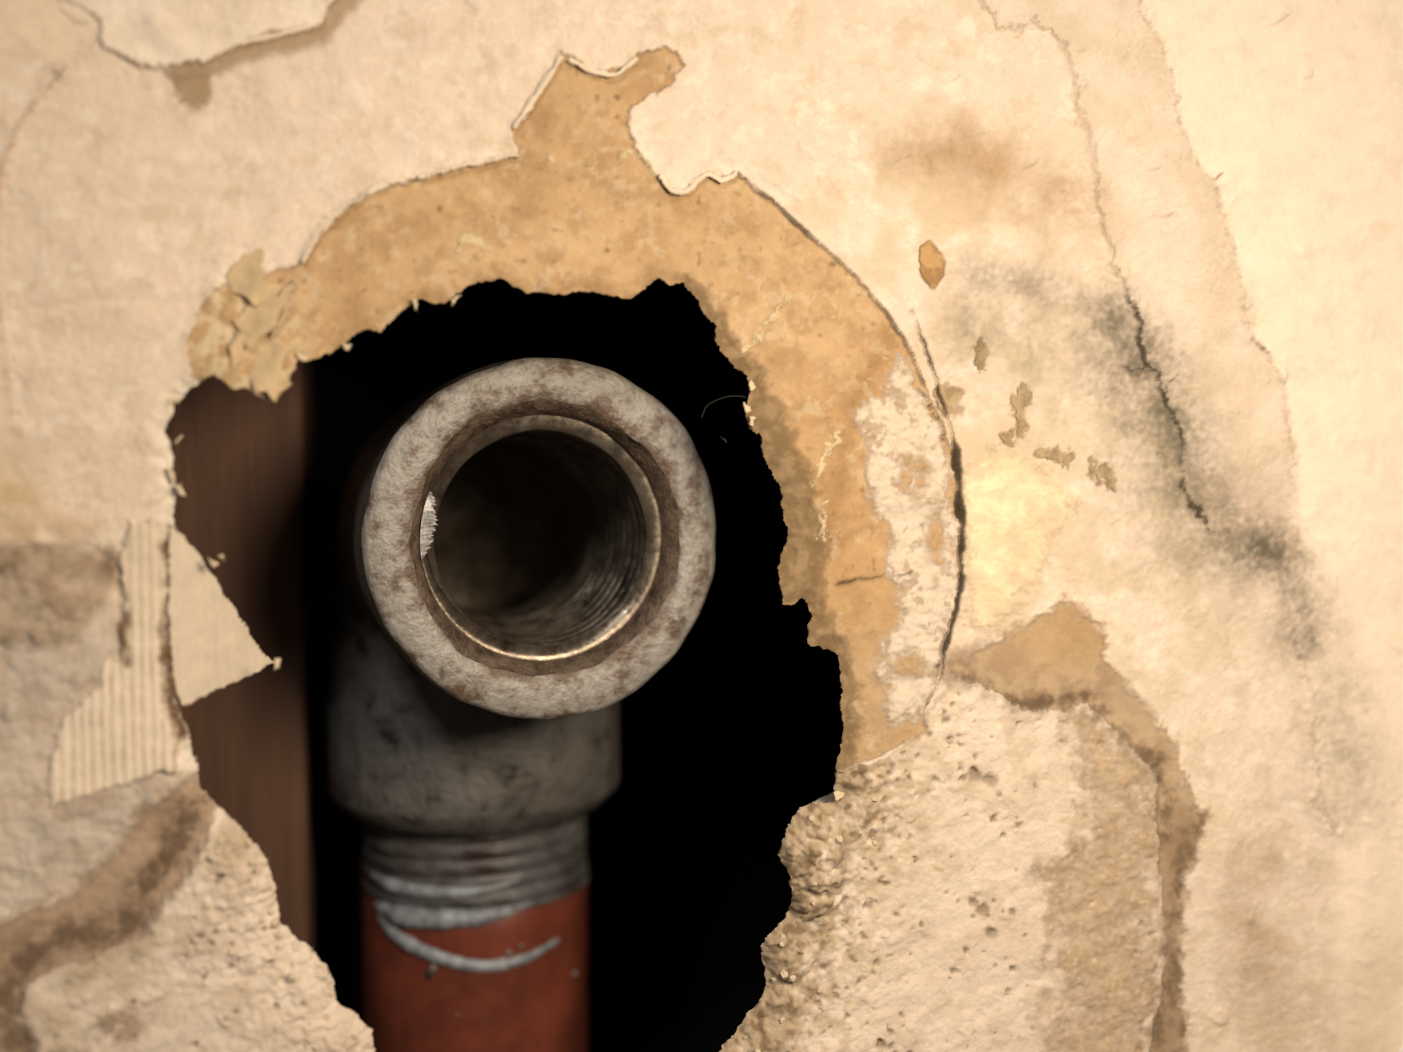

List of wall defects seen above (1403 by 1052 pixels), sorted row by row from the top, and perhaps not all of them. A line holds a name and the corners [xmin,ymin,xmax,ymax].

peeling [71,0,356,106]
crack [738,172,816,239]
peeling [919,240,945,288]
crack [878,301,966,700]
crack [1128,299,1209,530]
spalling [0,248,1209,1052]